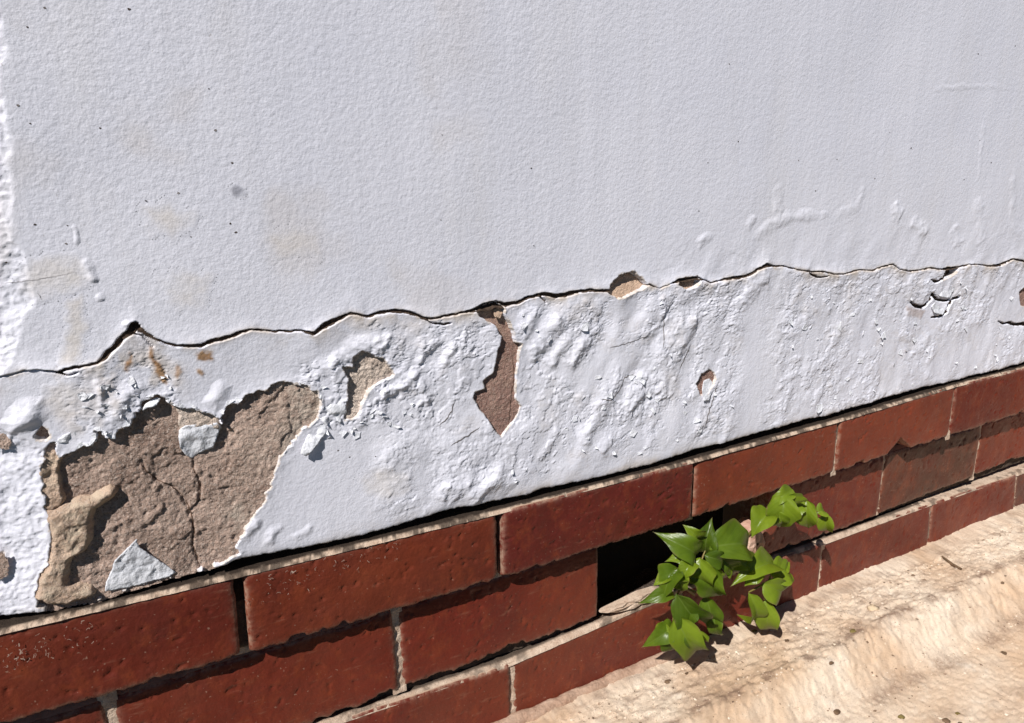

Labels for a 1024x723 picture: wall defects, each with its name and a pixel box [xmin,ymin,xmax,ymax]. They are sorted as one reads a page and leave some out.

flaking render [609,273,644,298]
crack [649,258,1024,289]
crack [4,289,611,376]
peeling [473,303,552,435]
crack [613,321,690,370]
peeling [696,370,716,401]
crack [998,319,1024,327]
flaking render [35,351,414,611]
spalling [592,562,679,619]